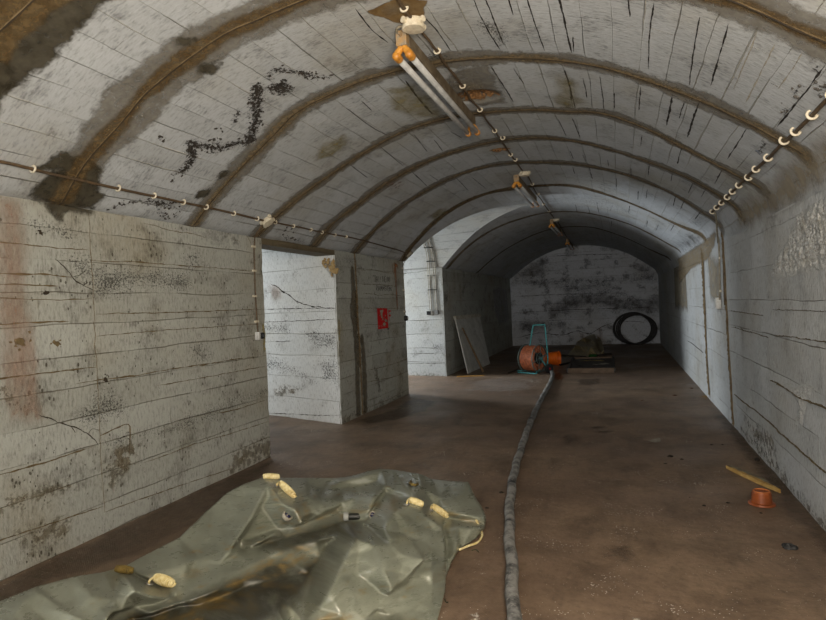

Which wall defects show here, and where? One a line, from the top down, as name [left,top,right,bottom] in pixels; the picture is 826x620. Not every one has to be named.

damp [0,0,111,99]
damp [30,0,427,239]
damp [249,87,461,238]
crack [474,0,545,101]
damp [309,19,826,247]
crack [558,0,650,226]
crack [647,4,655,69]
crack [646,17,747,230]
damp [672,0,826,63]
crack [778,65,825,125]
crack [0,220,335,541]
damp [338,160,774,467]